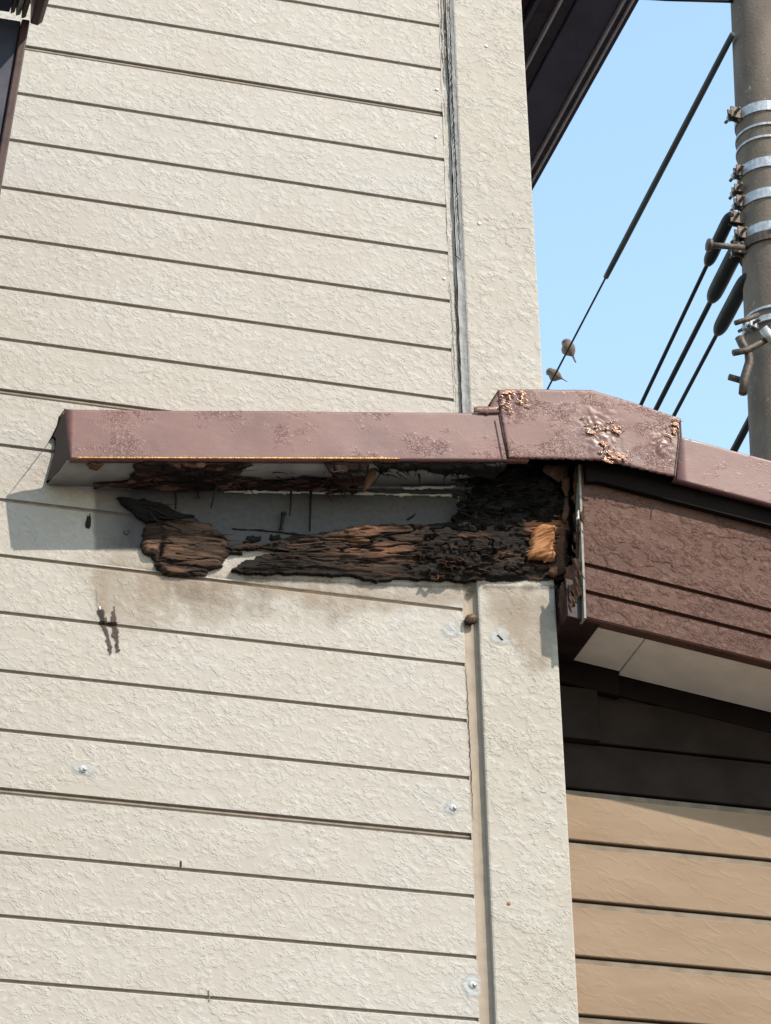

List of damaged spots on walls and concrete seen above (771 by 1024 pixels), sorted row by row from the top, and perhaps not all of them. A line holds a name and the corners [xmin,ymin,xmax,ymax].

peeling [110,488,466,549]
peeling [558,467,585,621]